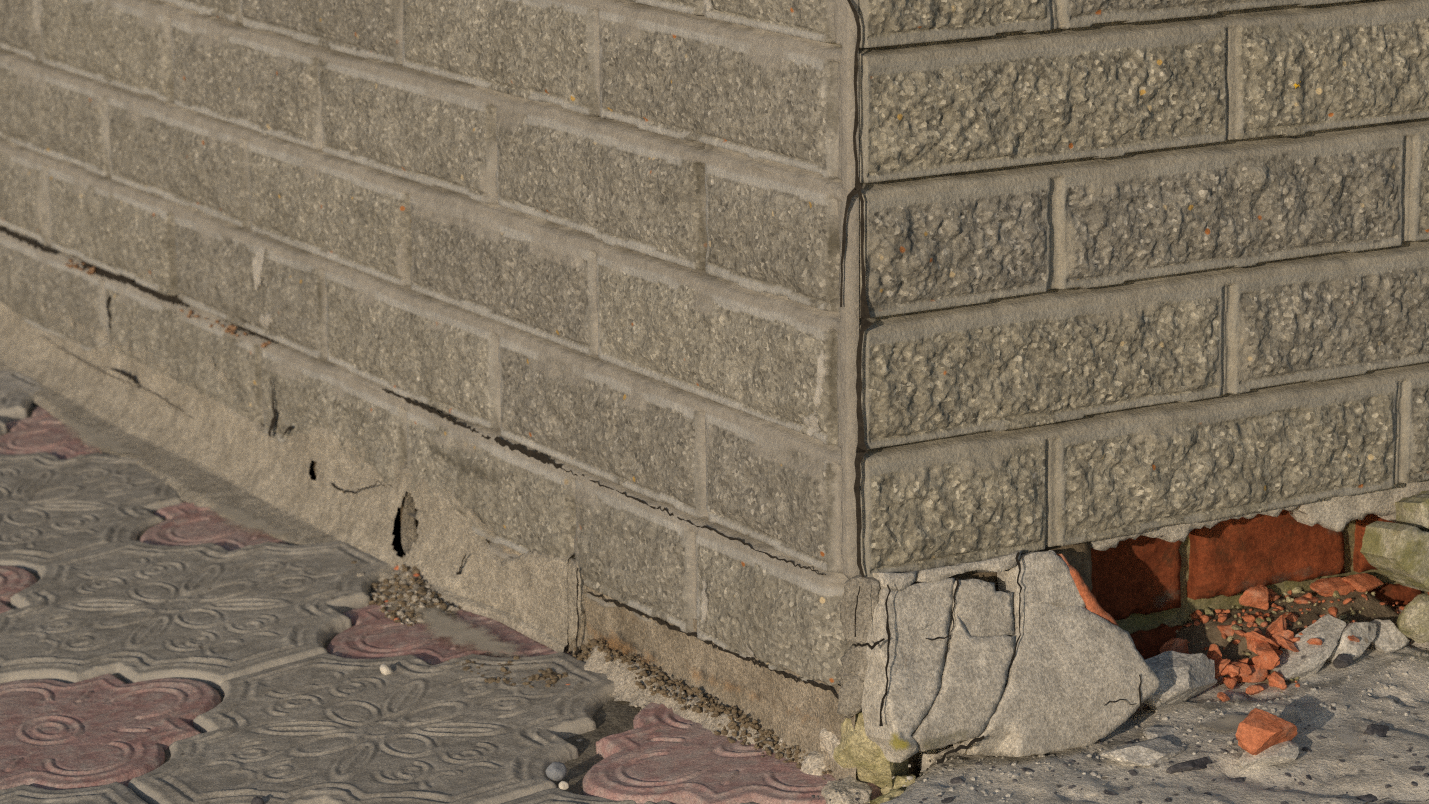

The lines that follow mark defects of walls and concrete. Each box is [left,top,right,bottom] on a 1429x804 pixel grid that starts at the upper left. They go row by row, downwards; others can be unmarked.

crack [836,0,1160,764]
spalling [1091,510,1429,660]